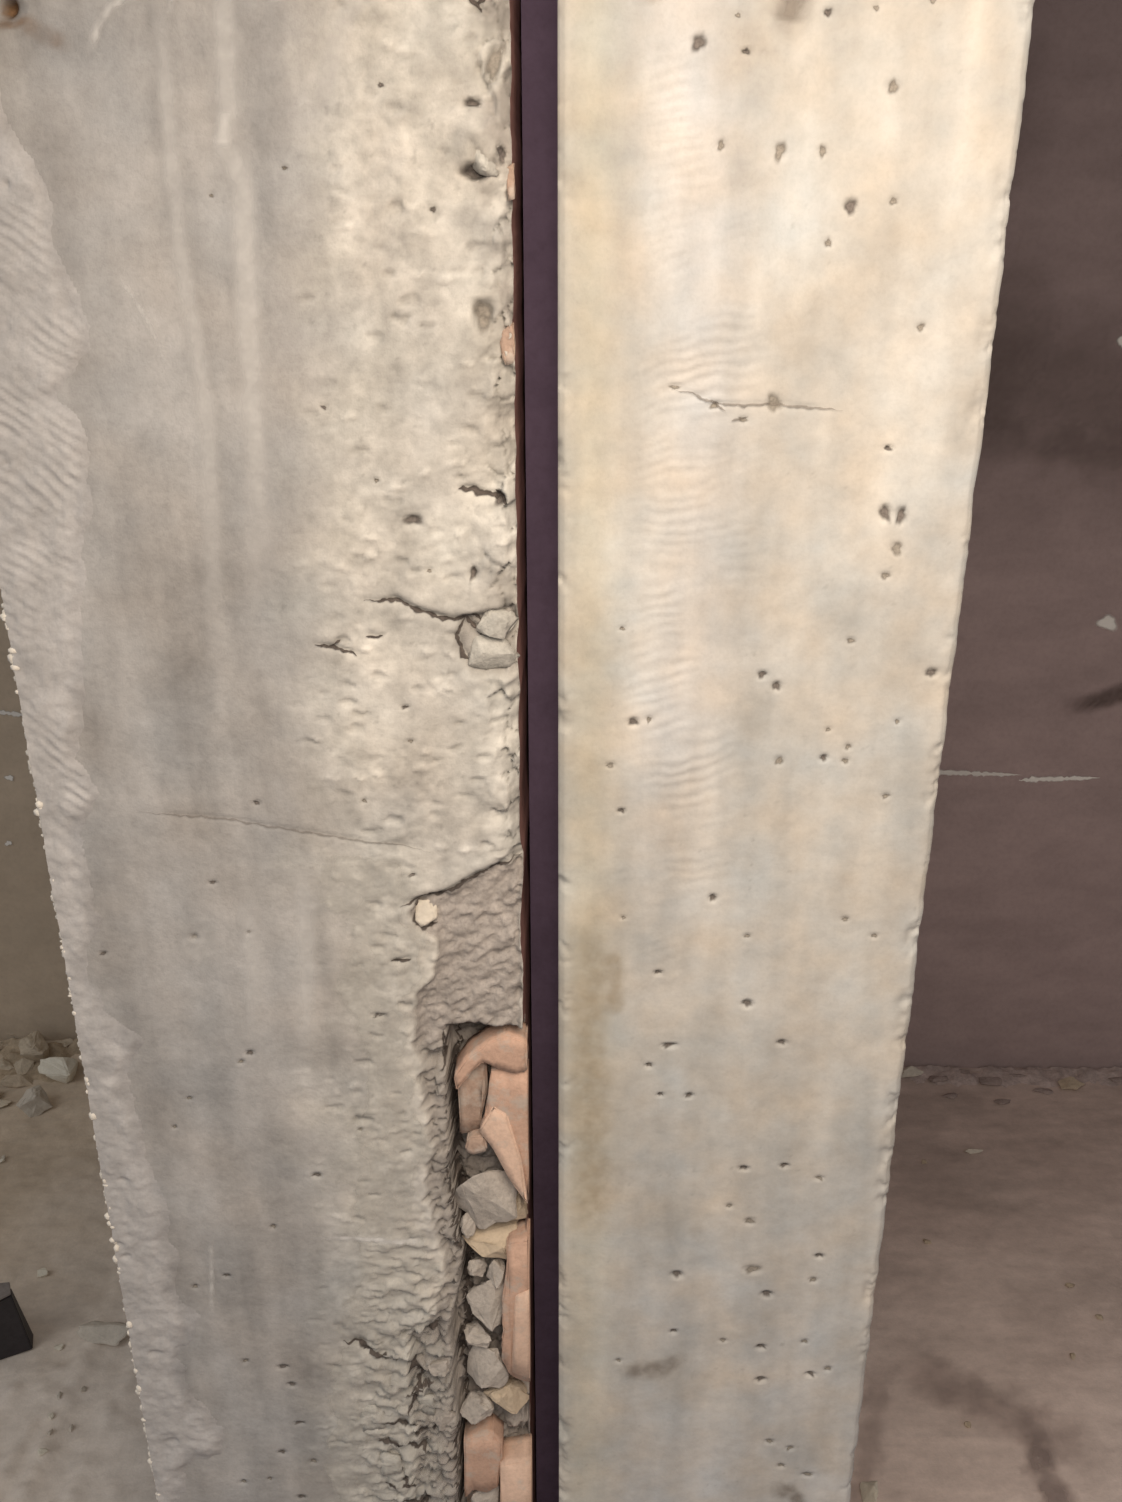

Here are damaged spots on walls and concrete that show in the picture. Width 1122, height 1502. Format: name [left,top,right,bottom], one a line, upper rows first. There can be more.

crack [317,597,482,659]
crack [676,390,843,421]
crack [343,1022,474,1502]
peeling [326,856,533,1502]